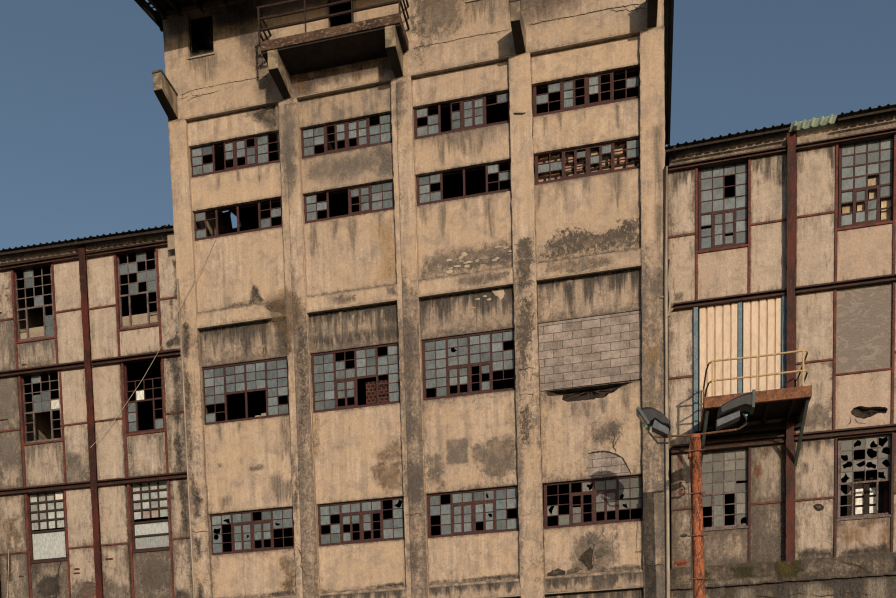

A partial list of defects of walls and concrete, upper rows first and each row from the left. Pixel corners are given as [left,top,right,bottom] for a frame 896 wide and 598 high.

water stain [411,0,462,50]
peeling [445,244,513,274]
water stain [202,286,418,458]
spalling [546,383,630,402]
water stain [166,288,202,561]
spalling [851,406,888,419]
water stain [372,405,532,502]
spalling [588,450,631,478]
spalling [547,537,609,576]
water stain [33,566,60,598]